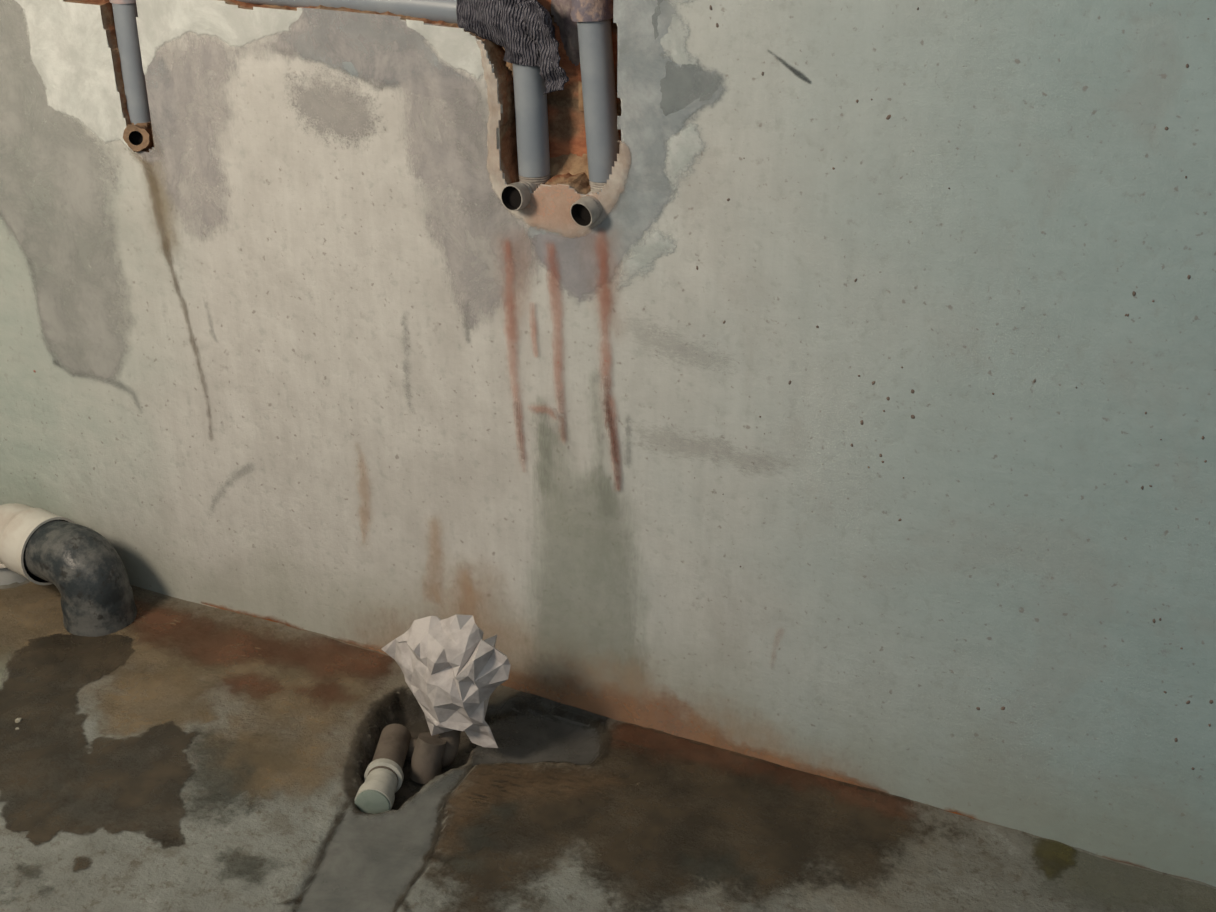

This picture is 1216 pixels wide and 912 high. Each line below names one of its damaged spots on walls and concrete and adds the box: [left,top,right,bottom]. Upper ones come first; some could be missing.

flaking render [63,0,131,127]
flaking render [140,37,230,233]
flaking render [221,0,610,325]
flaking render [611,18,621,147]
corrosion [604,401,619,489]
corrosion [133,602,392,701]
damp [0,634,273,848]
corrosion [501,673,881,792]
damp [73,857,90,871]